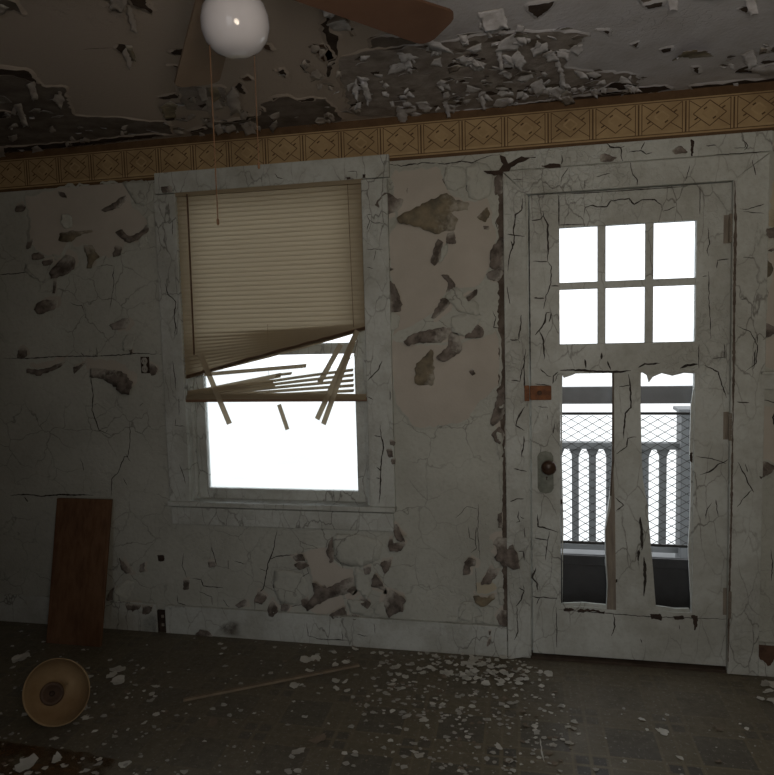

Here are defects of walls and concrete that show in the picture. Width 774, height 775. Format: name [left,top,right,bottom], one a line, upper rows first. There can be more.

peeling [524,0,558,19]
peeling [0,8,675,157]
peeling [15,180,173,314]
peeling [375,155,536,459]
crack [493,142,701,454]
crack [681,230,774,425]
crack [374,430,384,500]
crack [515,406,555,472]
crack [698,456,754,507]
peeling [235,521,408,620]
peeling [447,512,520,646]
crack [510,498,722,645]